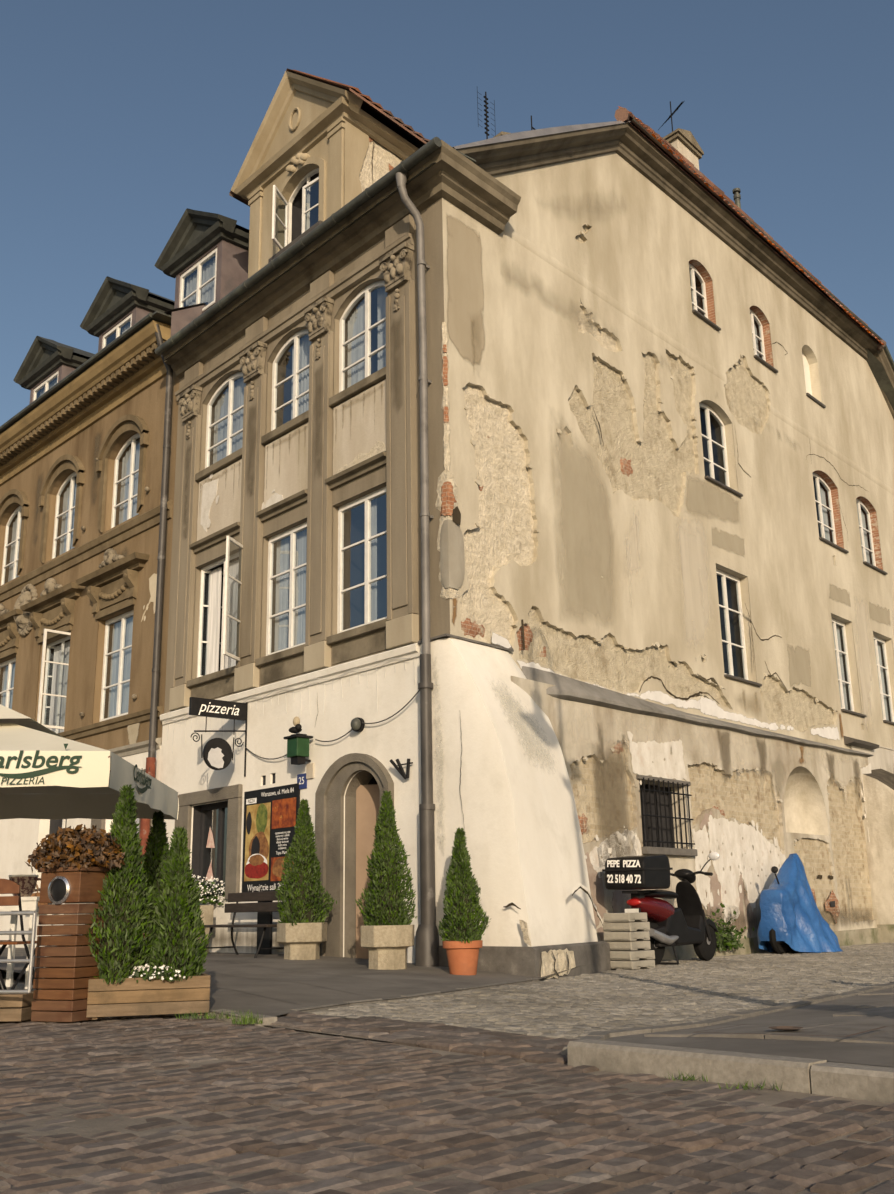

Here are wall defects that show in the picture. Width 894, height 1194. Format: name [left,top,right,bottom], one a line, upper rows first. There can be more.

spalling [359,137,403,192]
spalling [724,353,768,434]
flaking render [200,473,219,532]
spalling [435,304,727,707]
peeling [569,731,874,941]